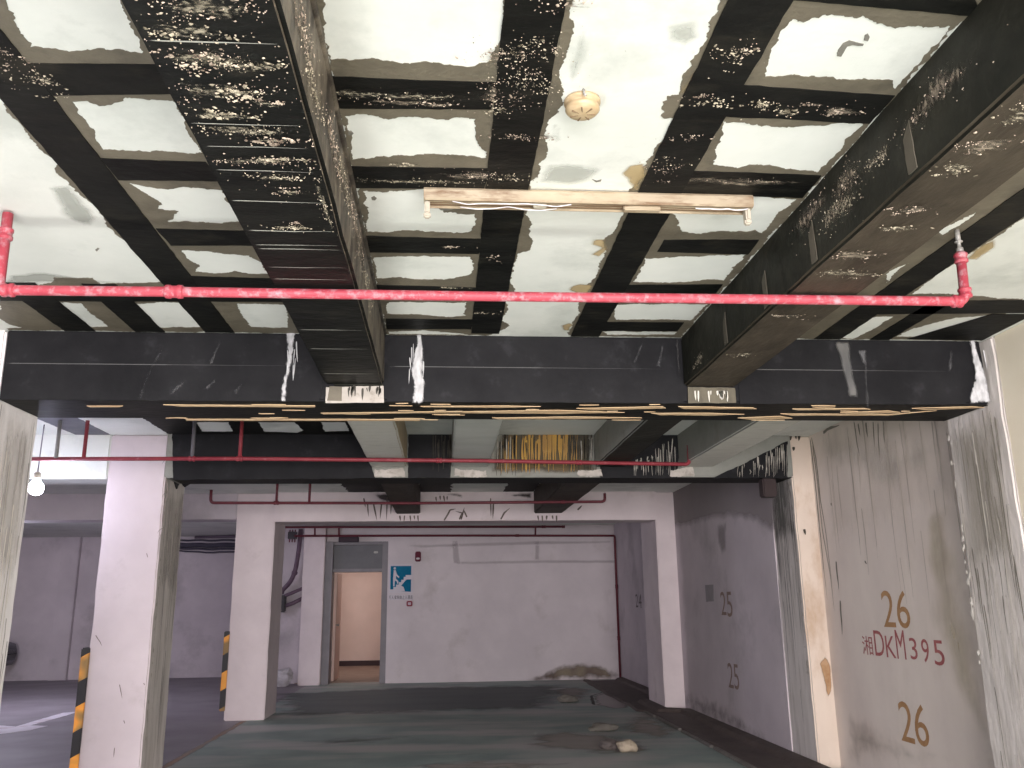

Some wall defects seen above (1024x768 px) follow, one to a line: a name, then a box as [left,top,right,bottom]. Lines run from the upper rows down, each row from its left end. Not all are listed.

leakage [0,427,34,684]
leakage [673,421,930,720]
leakage [919,411,1024,768]